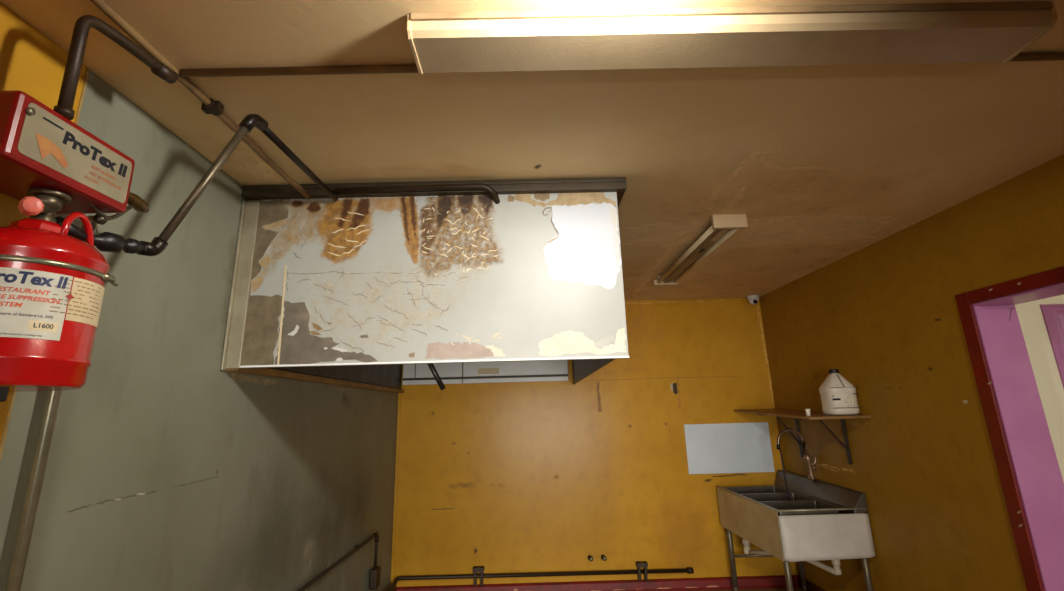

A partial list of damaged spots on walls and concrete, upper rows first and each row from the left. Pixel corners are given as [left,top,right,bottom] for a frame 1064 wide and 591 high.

crack [286,206,501,352]
peeling [507,192,622,289]
crack [69,491,155,512]